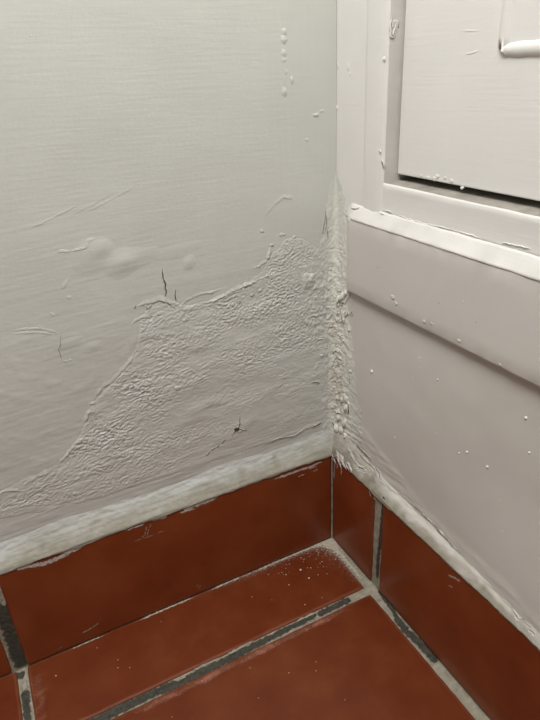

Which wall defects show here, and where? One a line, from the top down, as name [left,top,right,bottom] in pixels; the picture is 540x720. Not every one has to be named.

crack [160,268,177,302]
crack [205,417,247,456]
water stain [377,588,438,663]